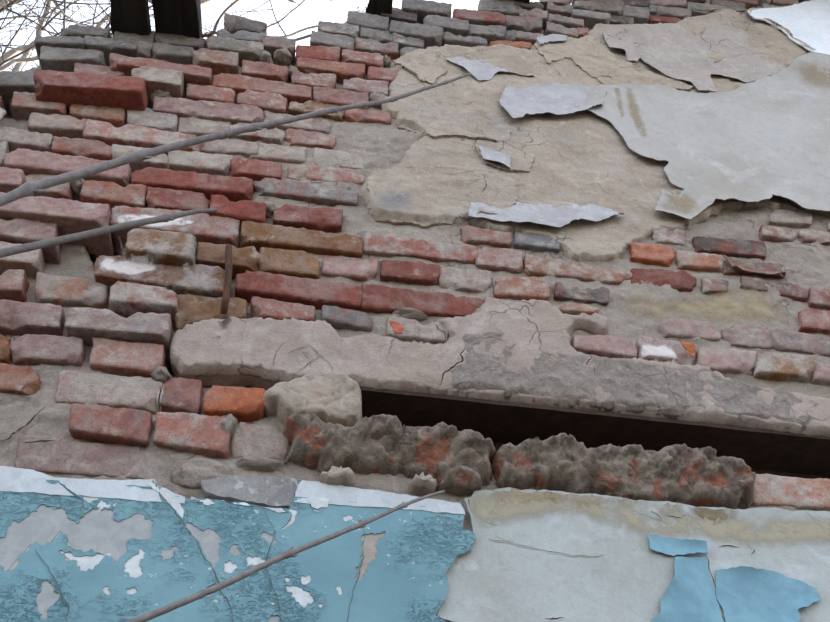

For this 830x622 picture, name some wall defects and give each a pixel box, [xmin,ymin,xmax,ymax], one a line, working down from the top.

flaking render [444,50,535,81]
flaking render [602,22,786,92]
flaking render [499,83,607,119]
leakage [629,94,642,127]
flaking render [479,146,511,169]
crack [435,324,507,385]
peeling [0,496,153,578]
peeling [149,483,297,573]
crack [462,498,604,558]
peeling [36,580,62,619]
peeling [284,574,323,608]
peeling [647,534,821,622]